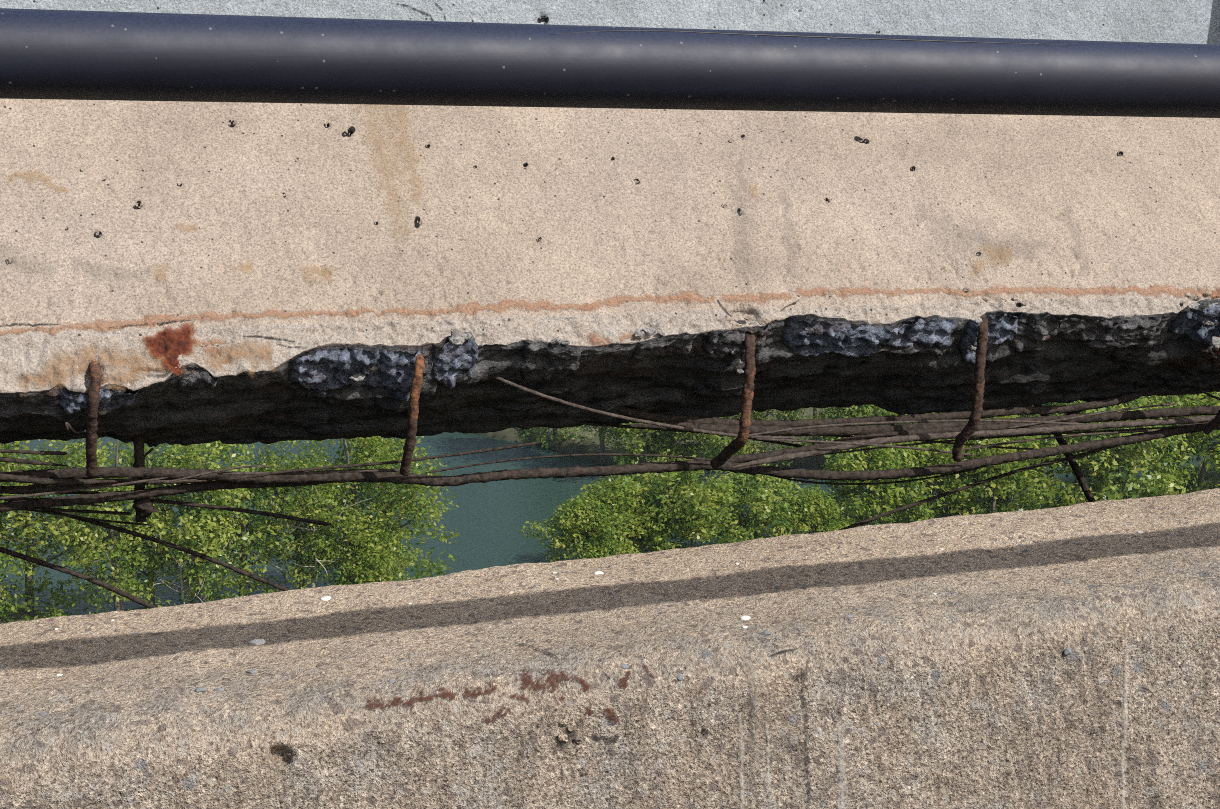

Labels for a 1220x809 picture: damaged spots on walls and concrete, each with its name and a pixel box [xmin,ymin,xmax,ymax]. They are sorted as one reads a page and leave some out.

crack [397,3,446,21]
corrosion [0,286,1220,386]
spalling [632,289,1220,374]
spalling [177,360,218,394]
spalling [288,330,482,401]
spalling [520,337,583,370]
spalling [52,383,139,415]
corrosion [617,663,655,688]
corrosion [365,682,498,710]
corrosion [483,667,590,727]
corrosion [585,707,618,724]